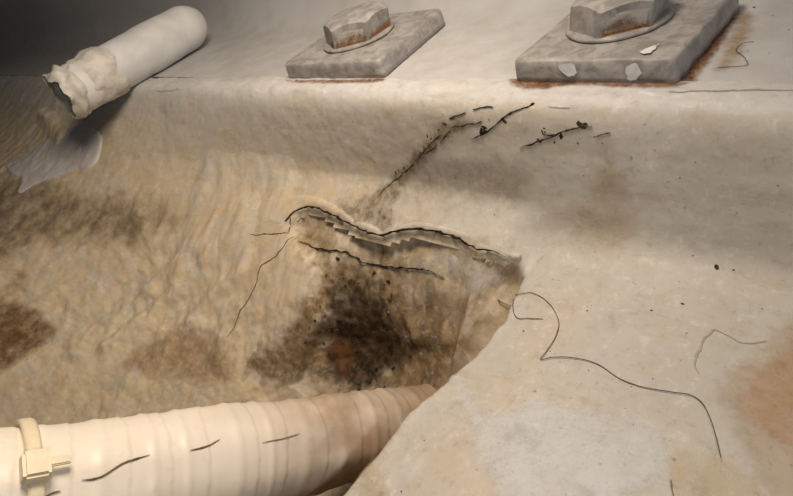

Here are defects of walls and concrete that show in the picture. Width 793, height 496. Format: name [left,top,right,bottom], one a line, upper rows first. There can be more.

rust [331,20,391,49]
rust [511,13,749,88]
crack [378,102,535,201]
crack [519,120,610,149]
water stain [0,183,117,242]
water stain [727,326,793,496]